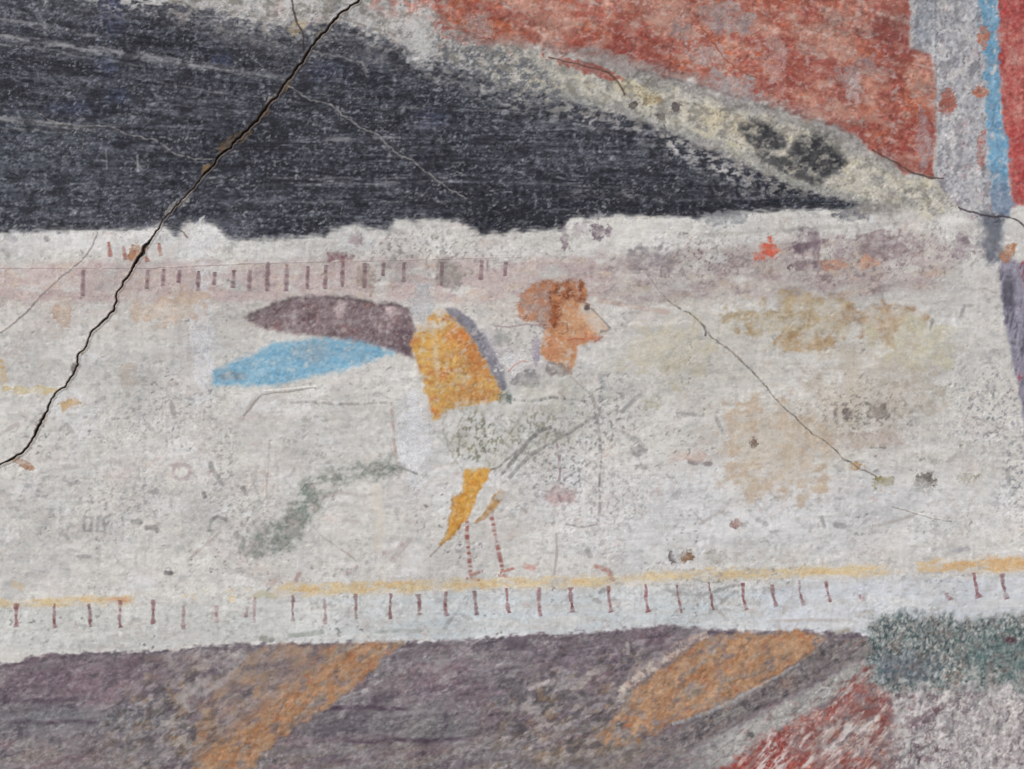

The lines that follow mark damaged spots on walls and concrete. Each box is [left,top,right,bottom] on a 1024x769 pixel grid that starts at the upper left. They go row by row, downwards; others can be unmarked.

crack [0,0,467,472]
crack [872,149,944,180]
crack [958,206,1024,227]
crack [634,263,876,477]